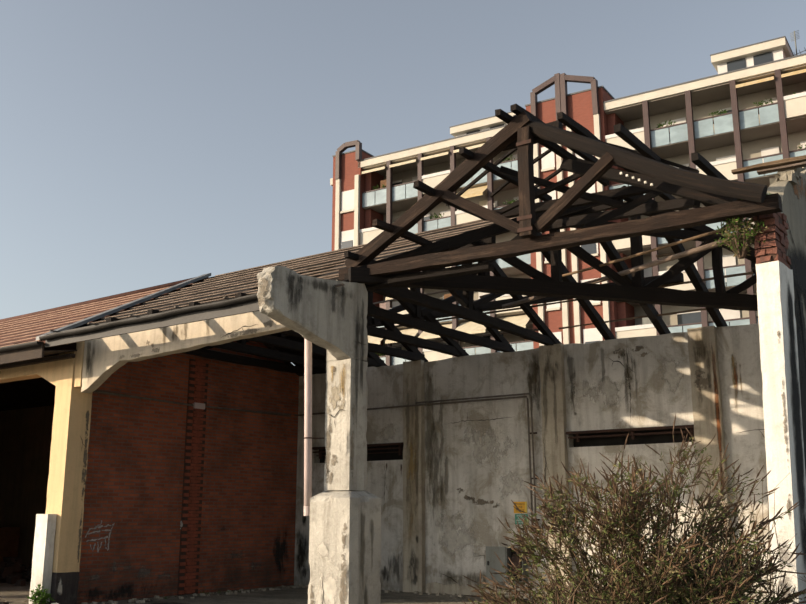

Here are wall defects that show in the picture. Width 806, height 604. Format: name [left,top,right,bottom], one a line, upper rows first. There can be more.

rust [712,353,723,485]
water stain [788,250,806,563]